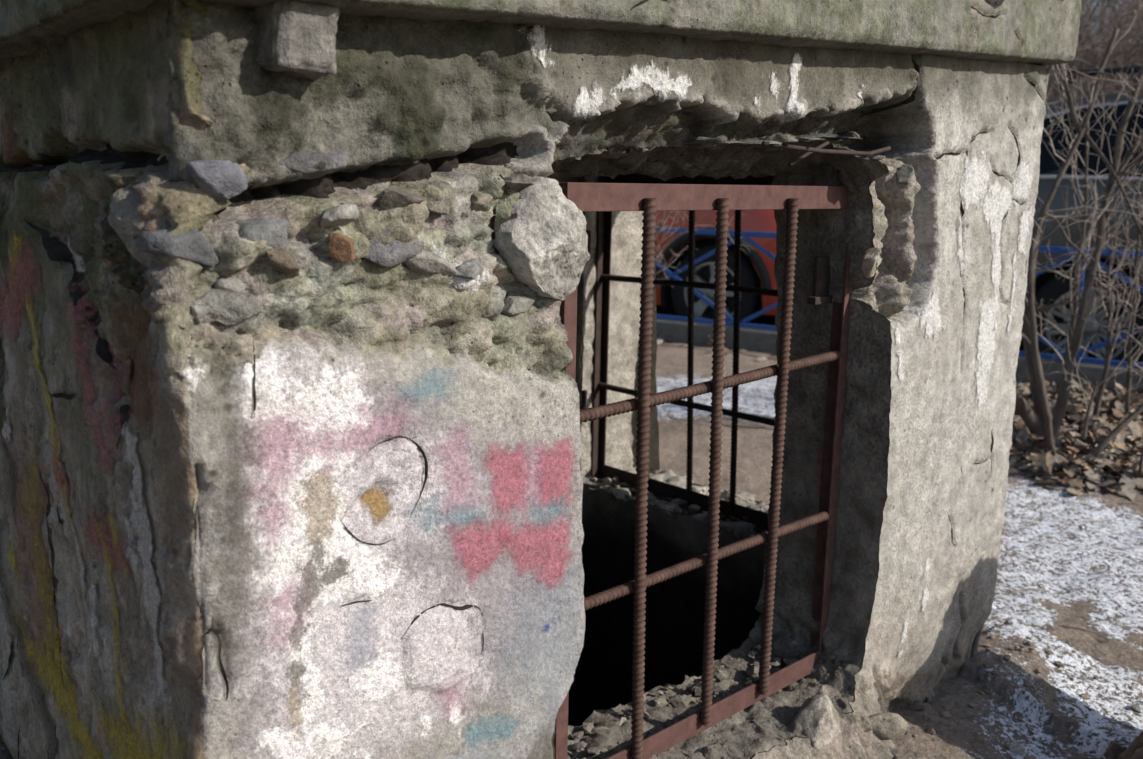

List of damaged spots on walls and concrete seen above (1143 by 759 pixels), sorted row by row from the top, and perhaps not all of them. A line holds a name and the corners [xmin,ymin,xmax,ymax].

crack [971,0,1019,39]
crack [214,142,519,215]
crack [935,127,1026,221]
crack [490,207,513,274]
spalling [35,0,934,759]
crack [371,436,428,518]
crack [340,520,394,545]
crack [203,617,229,700]
crack [401,603,484,655]